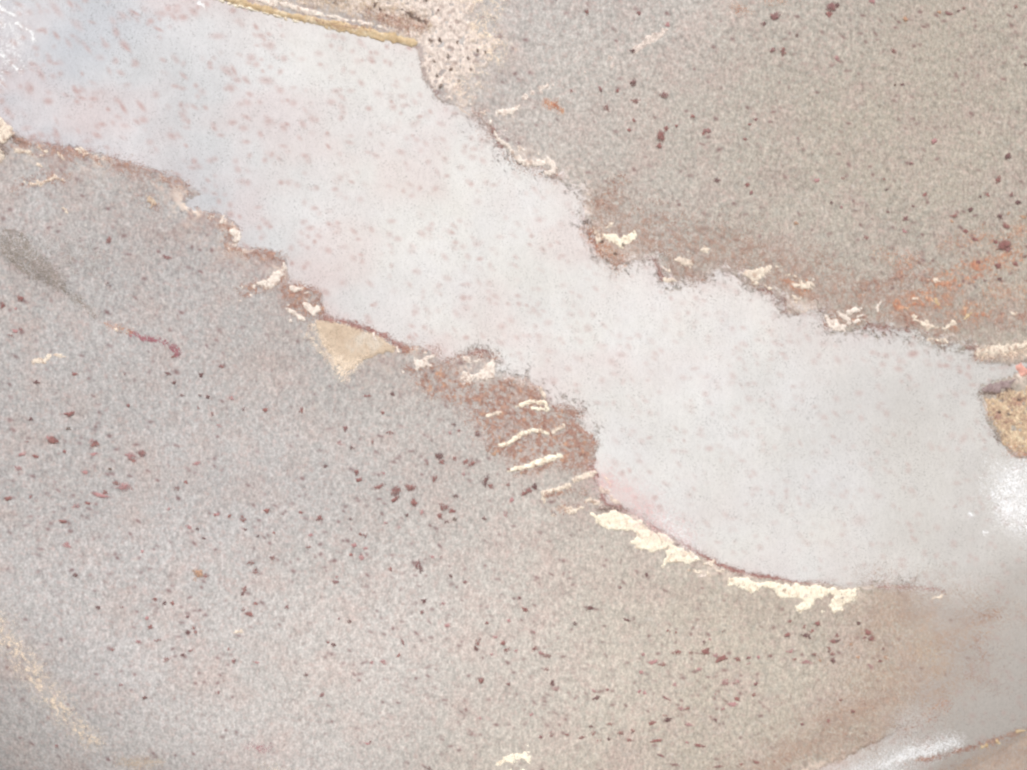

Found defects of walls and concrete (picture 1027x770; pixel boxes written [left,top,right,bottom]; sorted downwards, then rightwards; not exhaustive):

spalling [219,0,564,185]
spalling [0,117,192,215]
spalling [206,208,331,327]
spalling [579,219,637,277]
spalling [661,246,714,290]
spalling [739,265,815,304]
spalling [821,302,881,332]
spalling [397,338,501,386]
corrosion [408,356,604,518]
spalling [983,382,1027,462]
corrosion [374,472,424,528]
spalling [544,476,860,614]